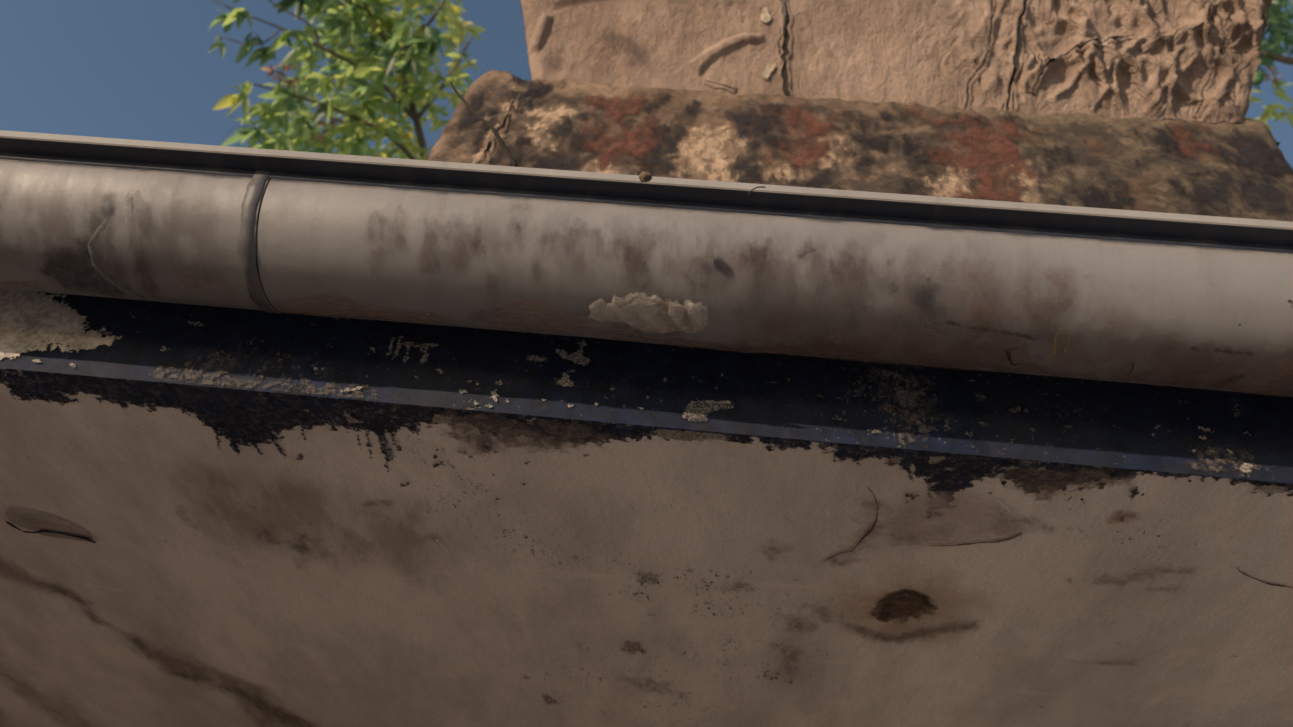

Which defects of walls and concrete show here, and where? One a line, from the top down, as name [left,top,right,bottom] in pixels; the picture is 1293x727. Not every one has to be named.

crack [774,0,793,97]
crack [961,0,1249,125]
water stain [444,75,700,179]
water stain [725,102,1293,218]
peeling [0,289,122,367]
peeling [154,338,376,424]
peeling [370,336,445,379]
peeling [459,379,509,408]
peeling [527,339,590,387]
peeling [653,400,733,441]
peeling [849,362,949,463]
peeling [1179,426,1287,495]